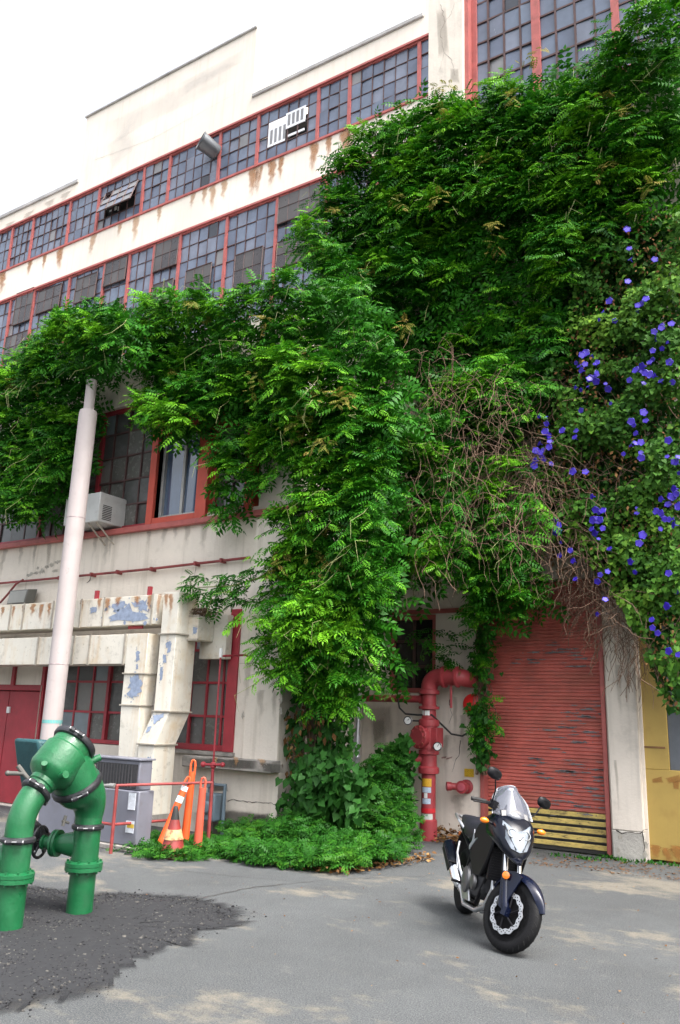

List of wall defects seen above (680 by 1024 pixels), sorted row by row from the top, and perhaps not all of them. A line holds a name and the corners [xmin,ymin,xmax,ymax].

corrosion [311,128,353,161]
corrosion [249,157,284,186]
corrosion [1,603,51,615]
peeling [90,598,158,625]
corrosion [136,594,173,608]
peeling [125,648,143,702]